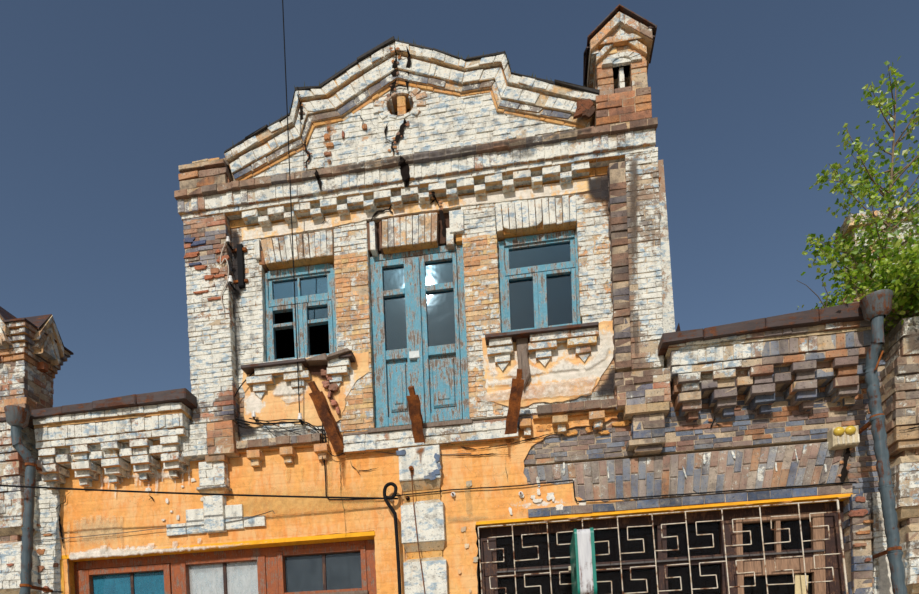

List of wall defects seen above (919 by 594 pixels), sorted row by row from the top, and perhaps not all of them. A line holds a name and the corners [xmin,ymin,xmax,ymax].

crack [386,44,411,97]
crack [297,93,322,191]
crack [355,115,446,237]
spalling [321,369,341,415]
peeling [484,379,512,401]
peeling [522,376,598,399]
peeling [564,413,631,437]
crack [836,448,854,483]
peeling [520,476,563,510]
crack [56,493,69,556]